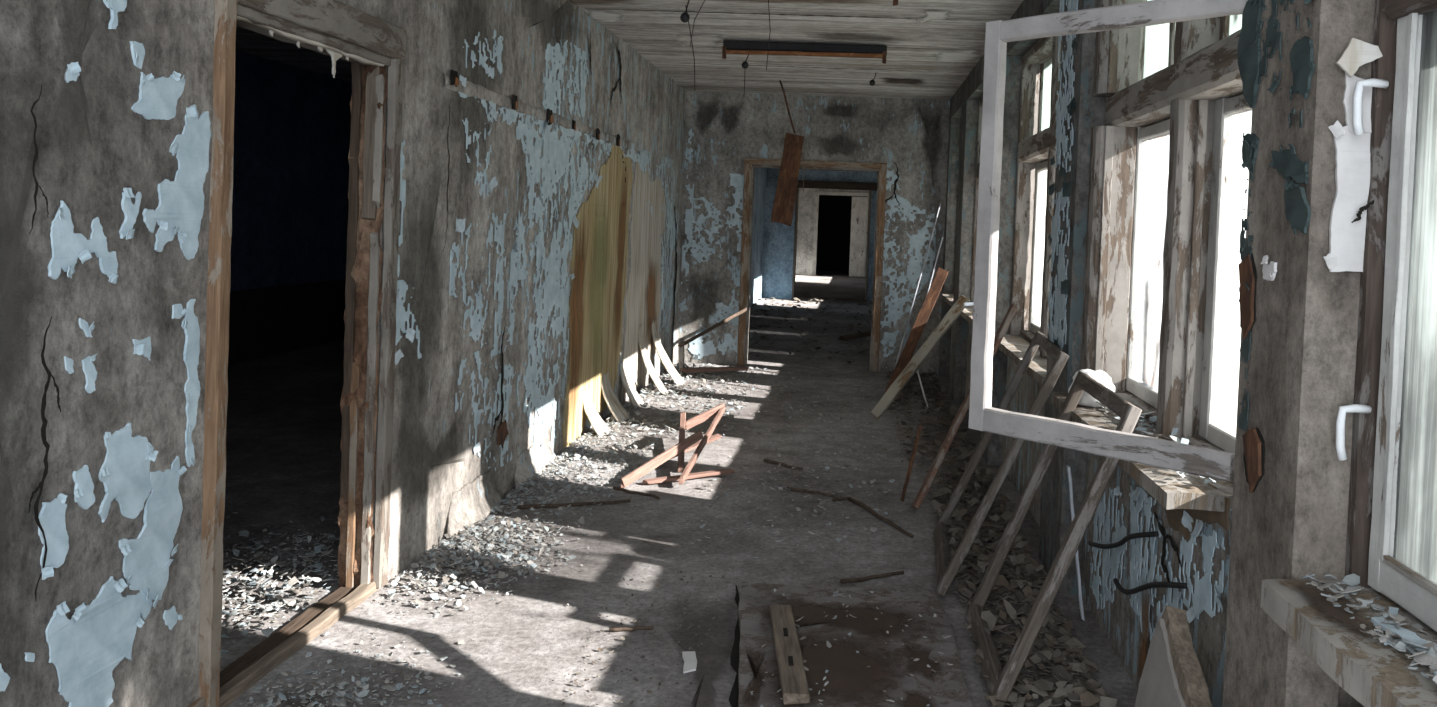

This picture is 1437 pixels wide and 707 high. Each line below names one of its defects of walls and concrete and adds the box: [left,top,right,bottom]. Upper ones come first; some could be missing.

peeling [103,0,127,29]
peeling [48,41,211,284]
peeling [449,30,744,471]
peeling [880,162,936,357]
peeling [1237,0,1315,493]
peeling [1324,38,1382,272]
peeling [24,299,201,707]
peeling [1088,483,1230,641]